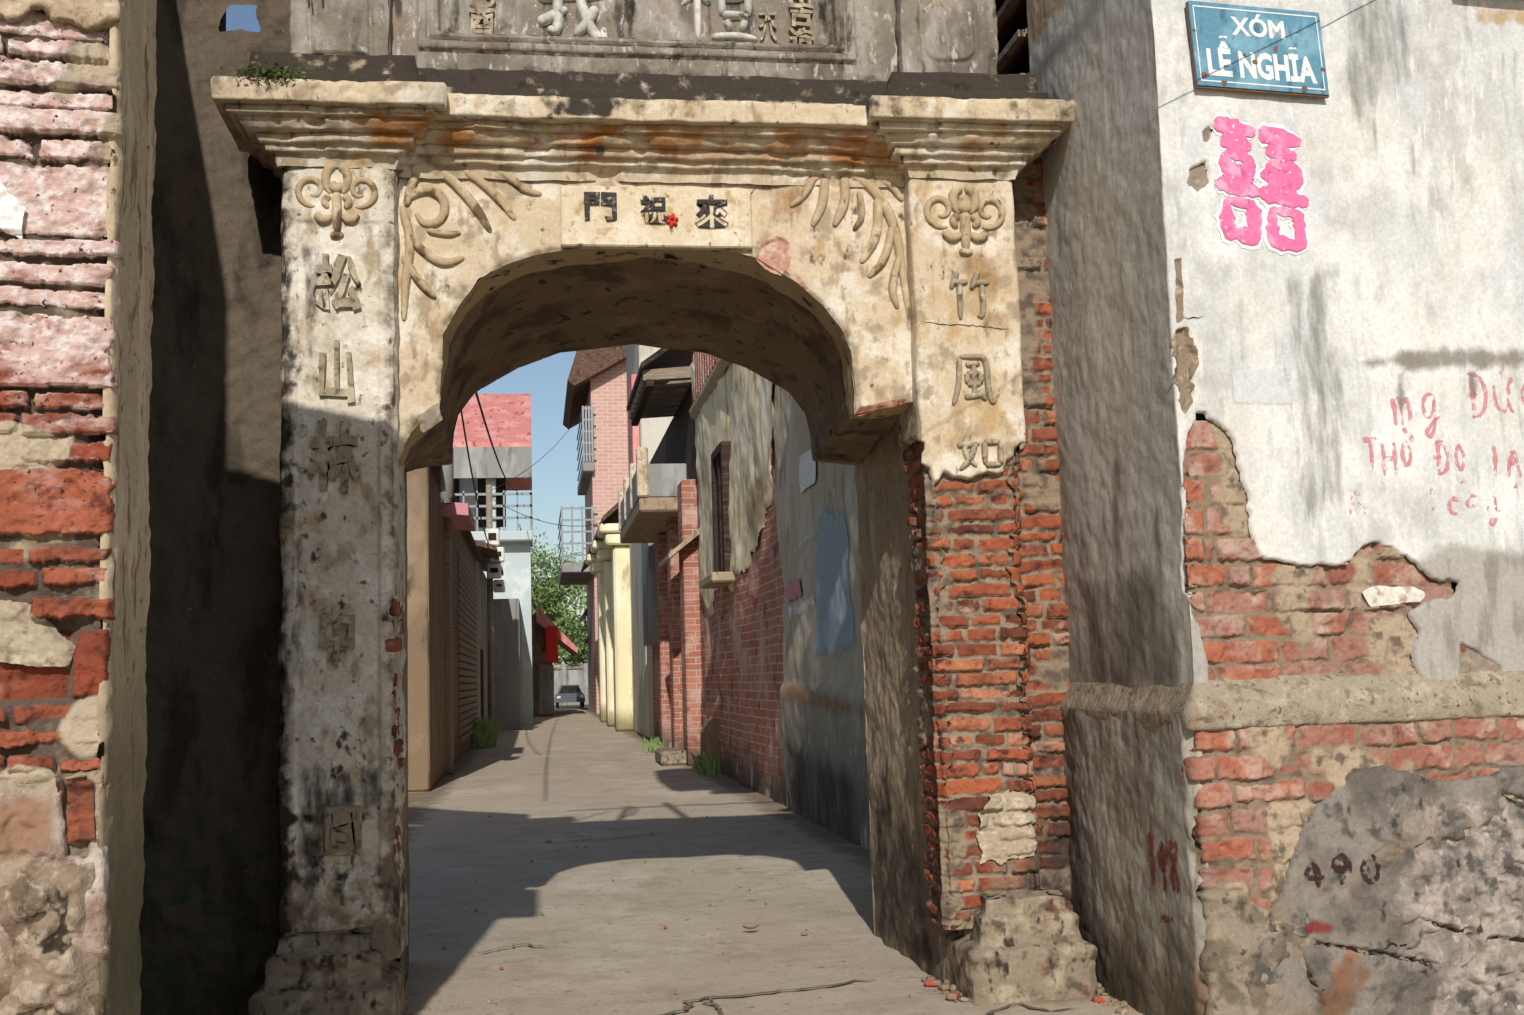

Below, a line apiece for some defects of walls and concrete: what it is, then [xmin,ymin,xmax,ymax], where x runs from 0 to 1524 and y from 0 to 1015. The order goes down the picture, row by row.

damp [819,2,827,30]
flaking render [0,9,127,1015]
flaking render [902,440,1042,931]
flaking render [1171,258,1454,680]